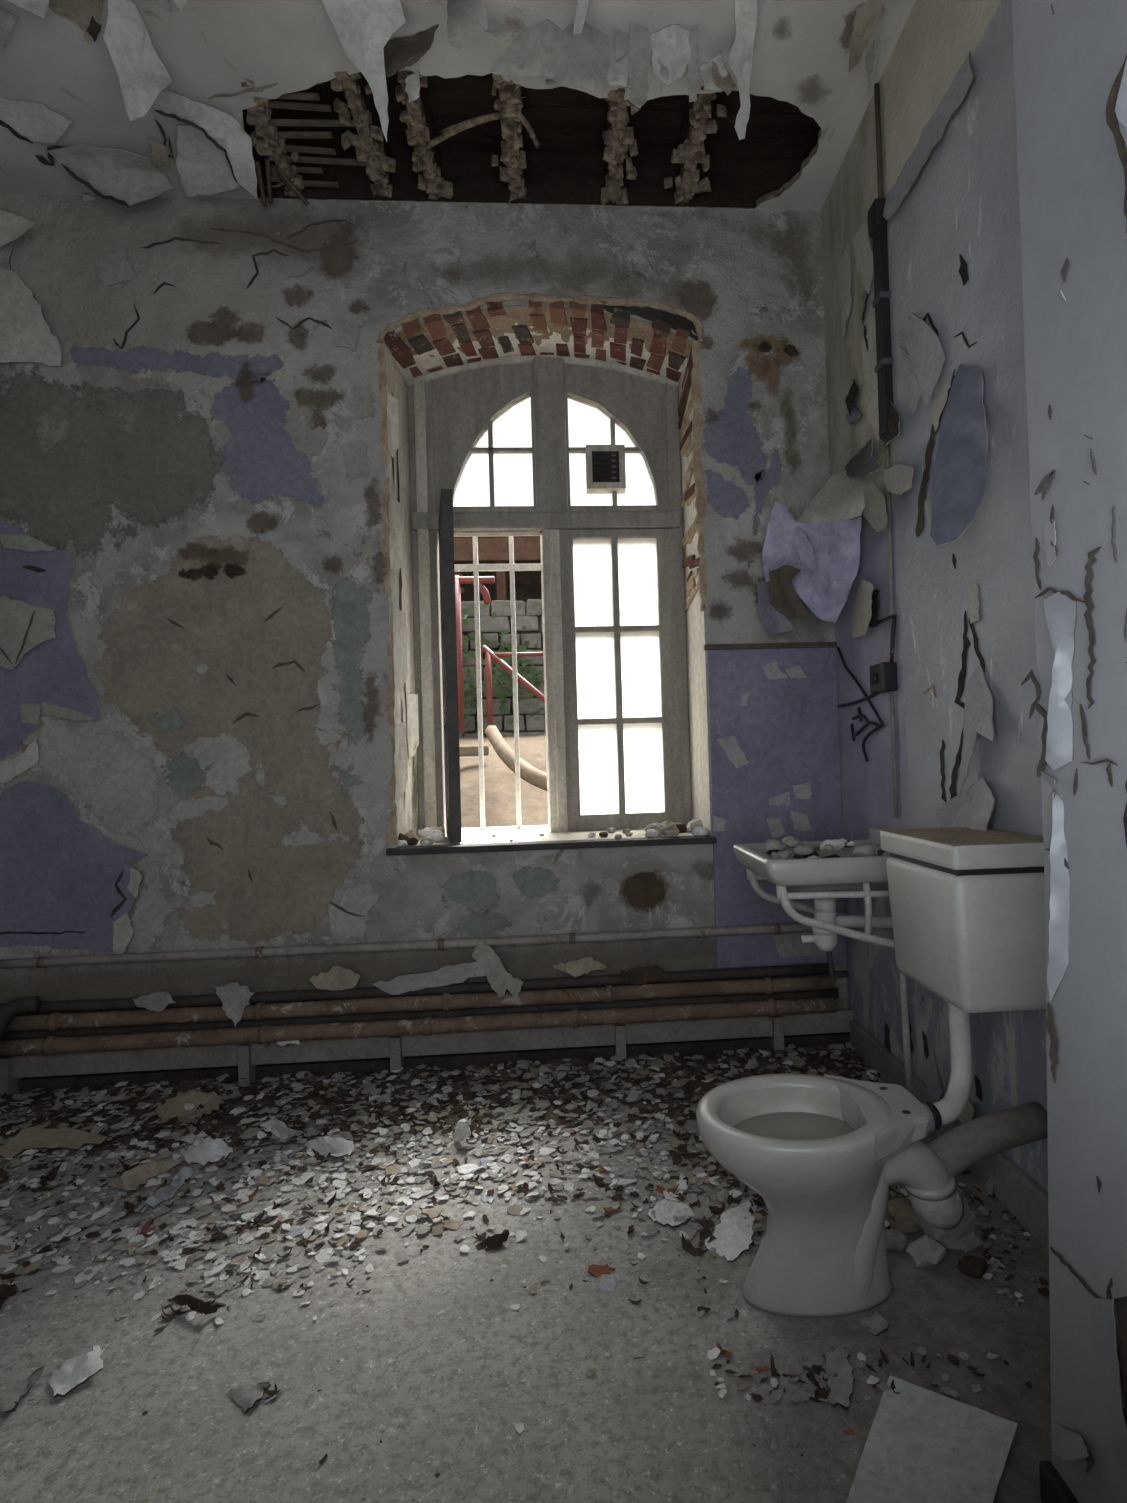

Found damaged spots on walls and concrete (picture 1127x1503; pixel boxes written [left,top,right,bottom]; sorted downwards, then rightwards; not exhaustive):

peeling [0,0,278,207]
peeling [322,0,757,142]
crack [141,219,358,289]
crack [113,282,176,349]
crack [276,317,332,330]
peeling [757,51,988,639]
water stain [246,512,278,533]
water stain [365,479,381,526]
water stain [178,542,247,582]
flaking render [0,519,366,954]
water stain [363,676,379,739]
peeling [1021,547,1101,1083]